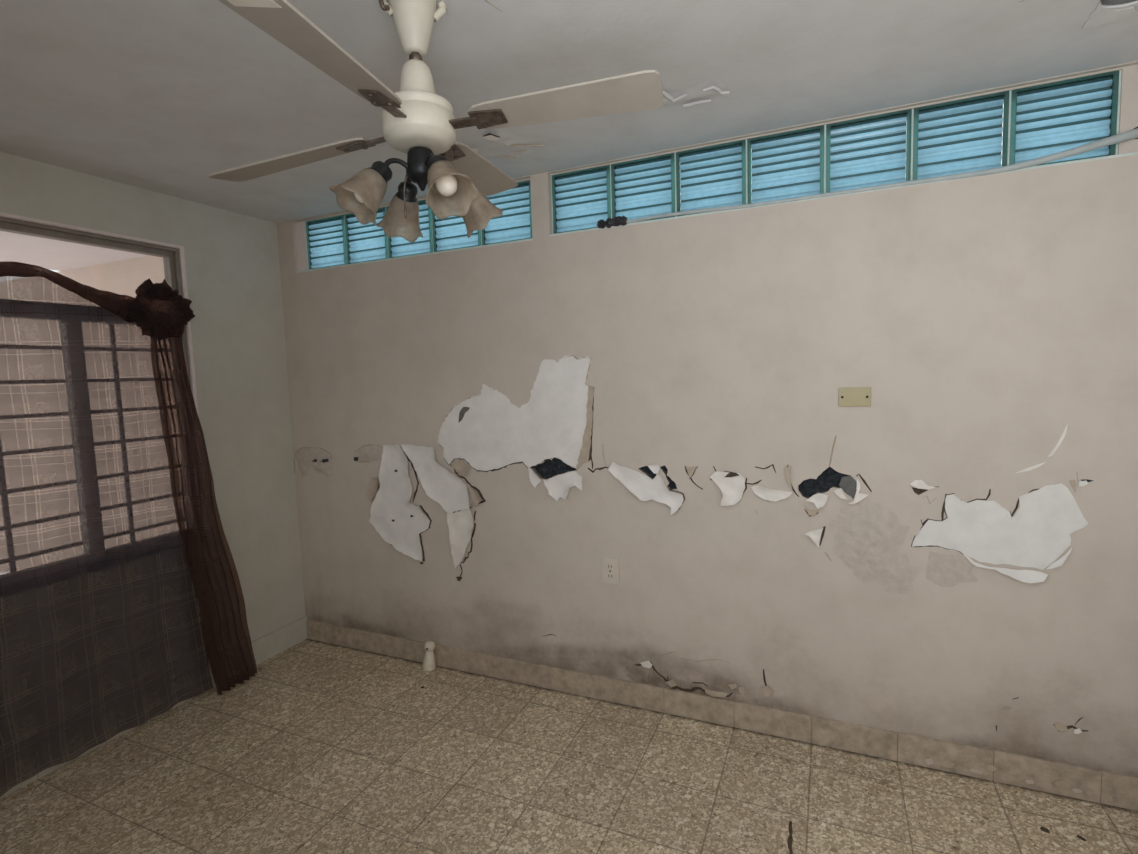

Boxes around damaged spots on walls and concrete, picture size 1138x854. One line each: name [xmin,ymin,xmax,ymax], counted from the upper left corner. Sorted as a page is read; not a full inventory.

flaking render [1082,0,1138,33]
peeling [367,355,594,582]
peeling [608,462,685,515]
flaking render [710,436,872,561]
peeling [910,472,1094,583]